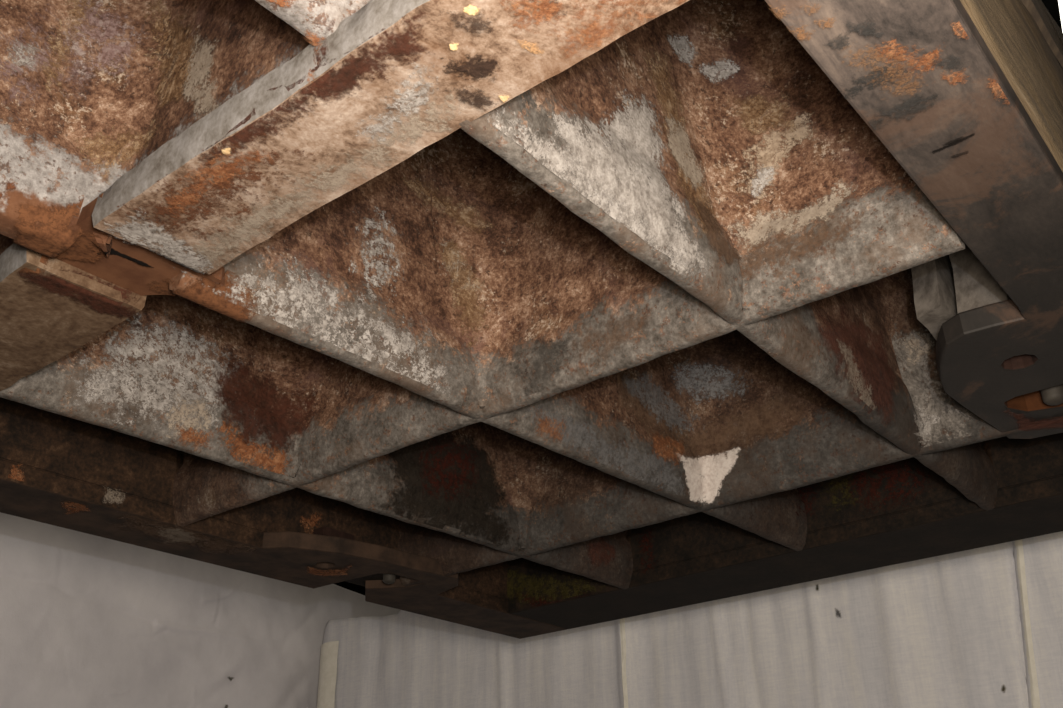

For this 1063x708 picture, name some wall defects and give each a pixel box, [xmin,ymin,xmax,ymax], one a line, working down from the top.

corrosion [843,39,969,95]
corrosion [14,198,139,319]
corrosion [148,270,258,322]
damp [215,359,317,449]
corrosion [177,419,292,474]
spalling [677,447,741,503]